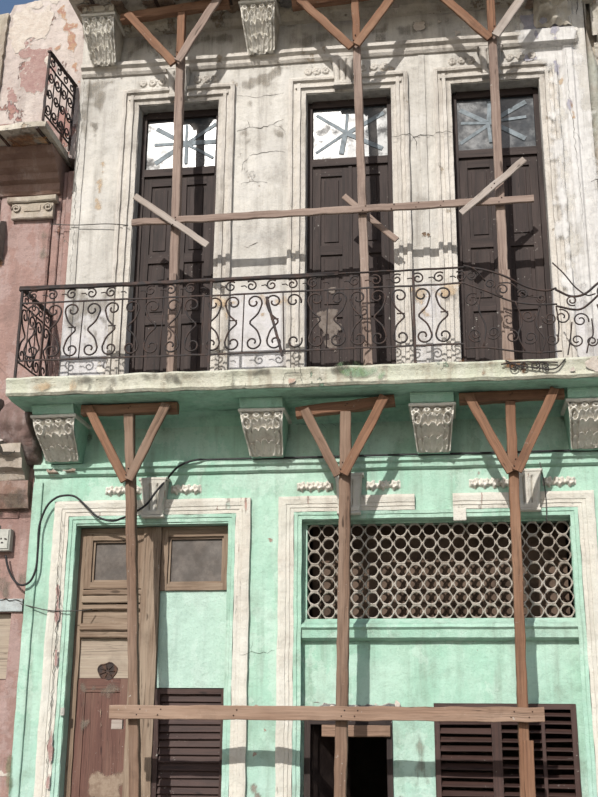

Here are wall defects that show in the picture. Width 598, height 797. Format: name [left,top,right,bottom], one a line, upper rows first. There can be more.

peeling [7,0,81,103]
spalling [76,0,128,15]